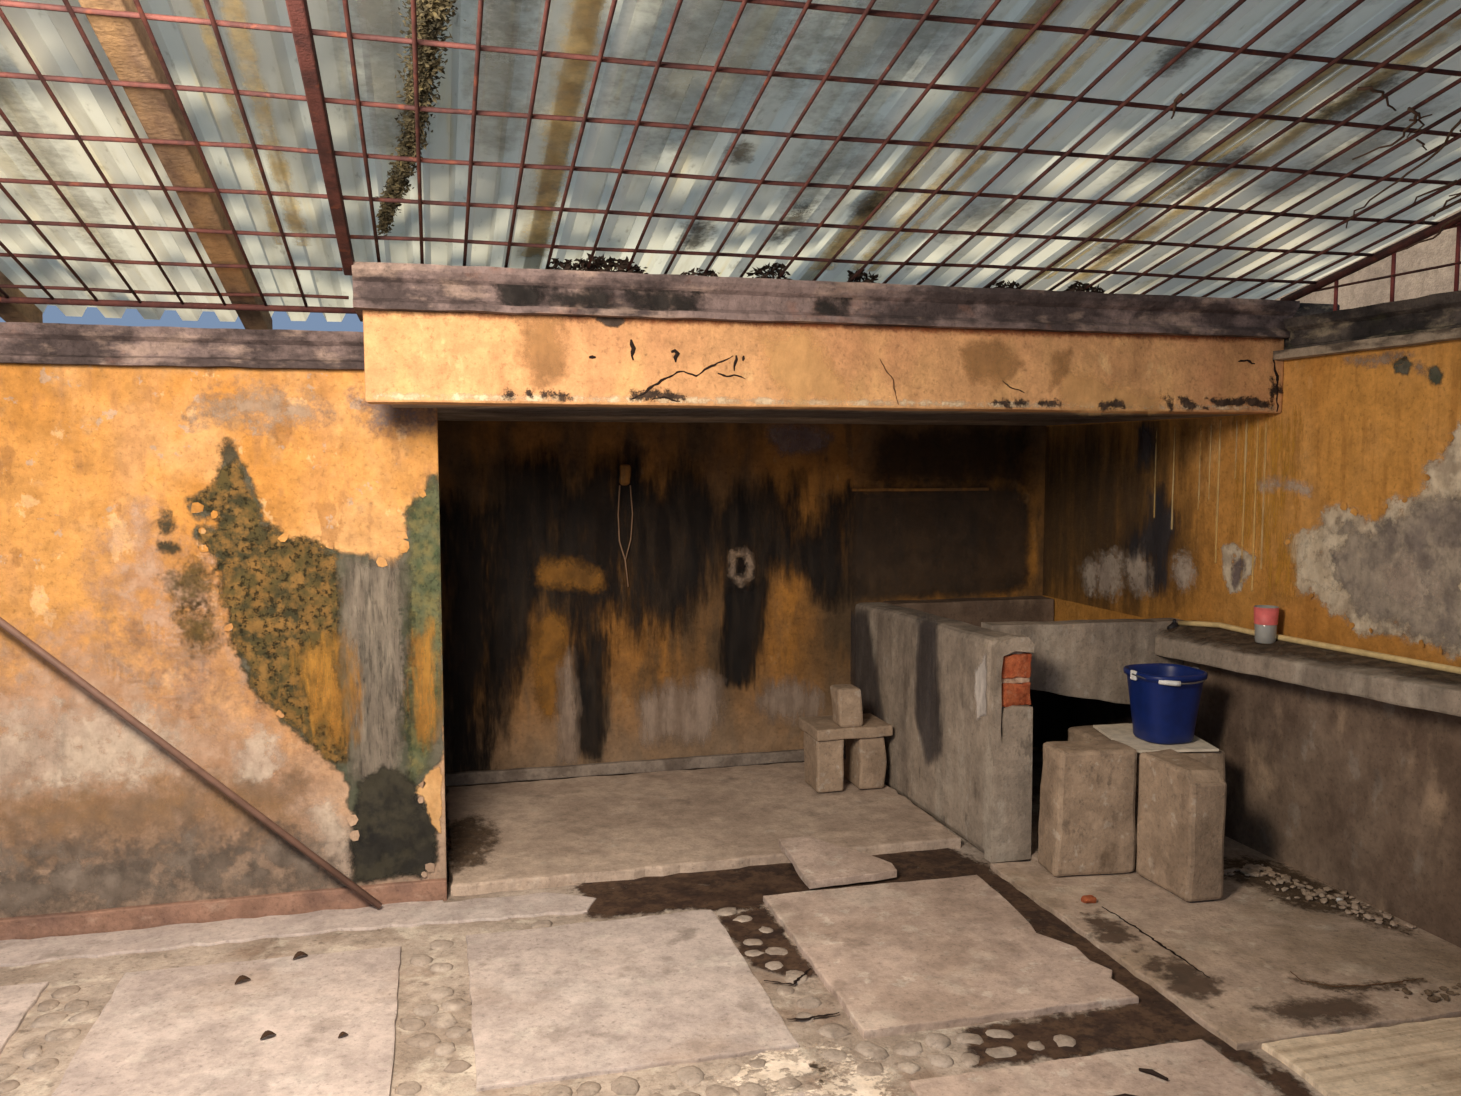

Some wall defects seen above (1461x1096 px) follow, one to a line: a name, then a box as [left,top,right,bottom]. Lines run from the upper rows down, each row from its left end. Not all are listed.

peeling [0,390,444,883]
damp [439,449,884,773]
crack [631,356,745,402]
damp [915,617,941,763]
damp [1053,350,1195,595]
damp [1198,412,1301,593]
peeling [1284,424,1461,658]
damp [0,699,356,917]